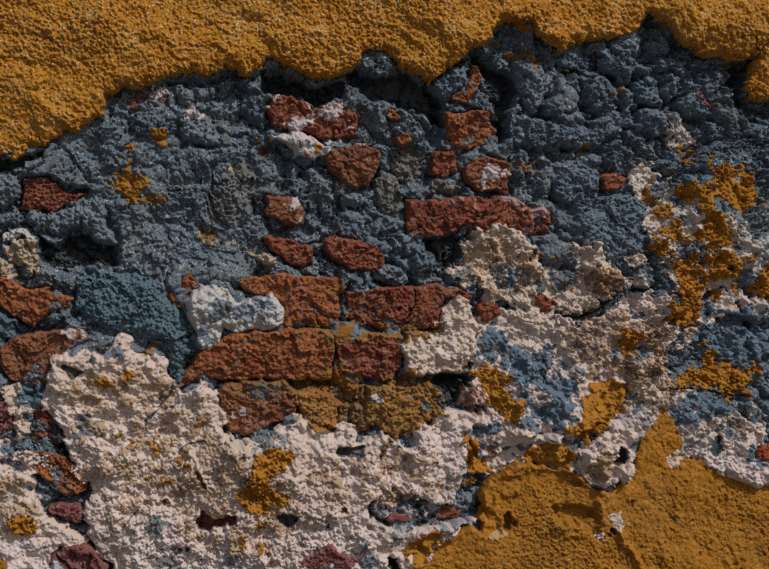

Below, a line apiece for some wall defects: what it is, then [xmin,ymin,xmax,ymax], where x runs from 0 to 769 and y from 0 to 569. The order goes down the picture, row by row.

crack [728,35,769,100]
peeling [0,114,769,569]